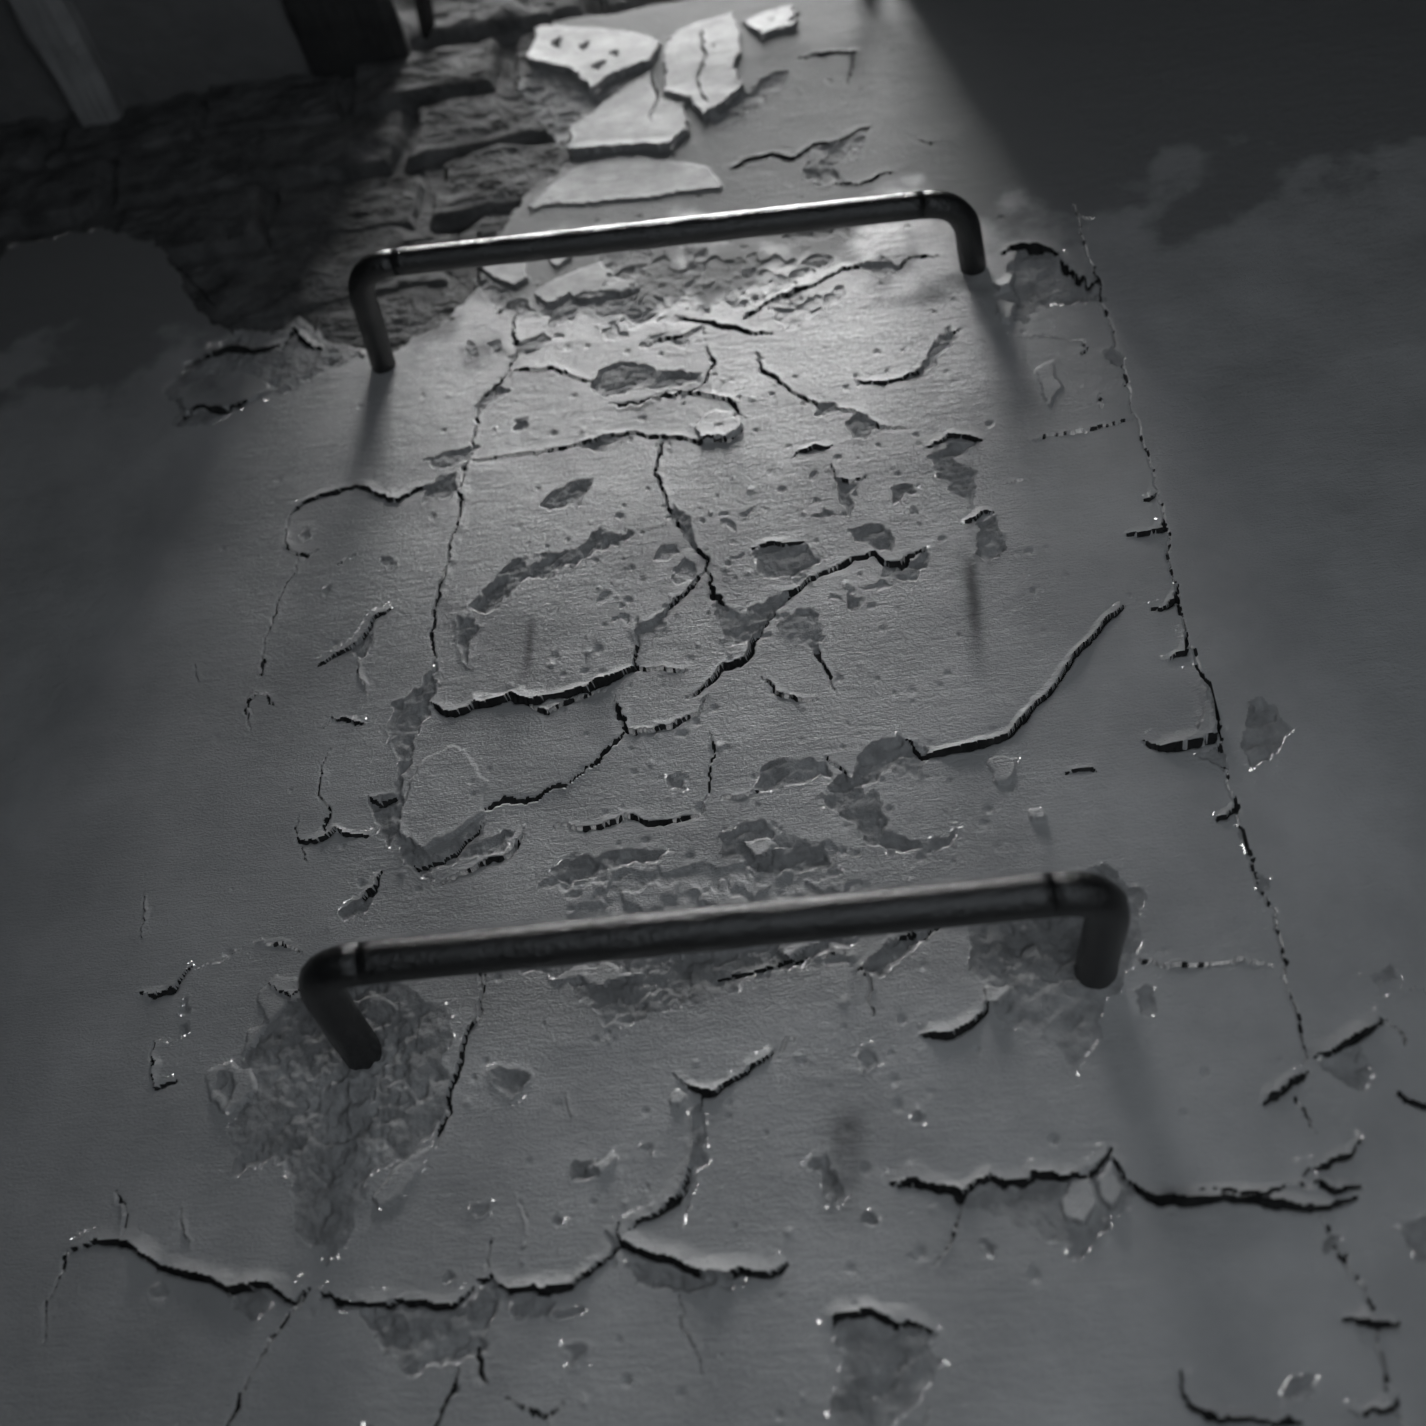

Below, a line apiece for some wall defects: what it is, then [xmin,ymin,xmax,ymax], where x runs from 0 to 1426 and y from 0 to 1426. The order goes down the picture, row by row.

flaking render [0,5,863,352]
crack [675,253,959,440]
peeling [993,239,1107,338]
crack [1076,211,1205,675]
crack [244,312,931,886]
flaking render [725,601,1125,856]
flaking render [520,937,854,1030]
flaking render [919,861,1148,1074]
crack [1134,733,1308,1058]
flaking render [206,975,502,1426]
peeling [887,1142,1135,1266]
crack [1112,1134,1401,1419]